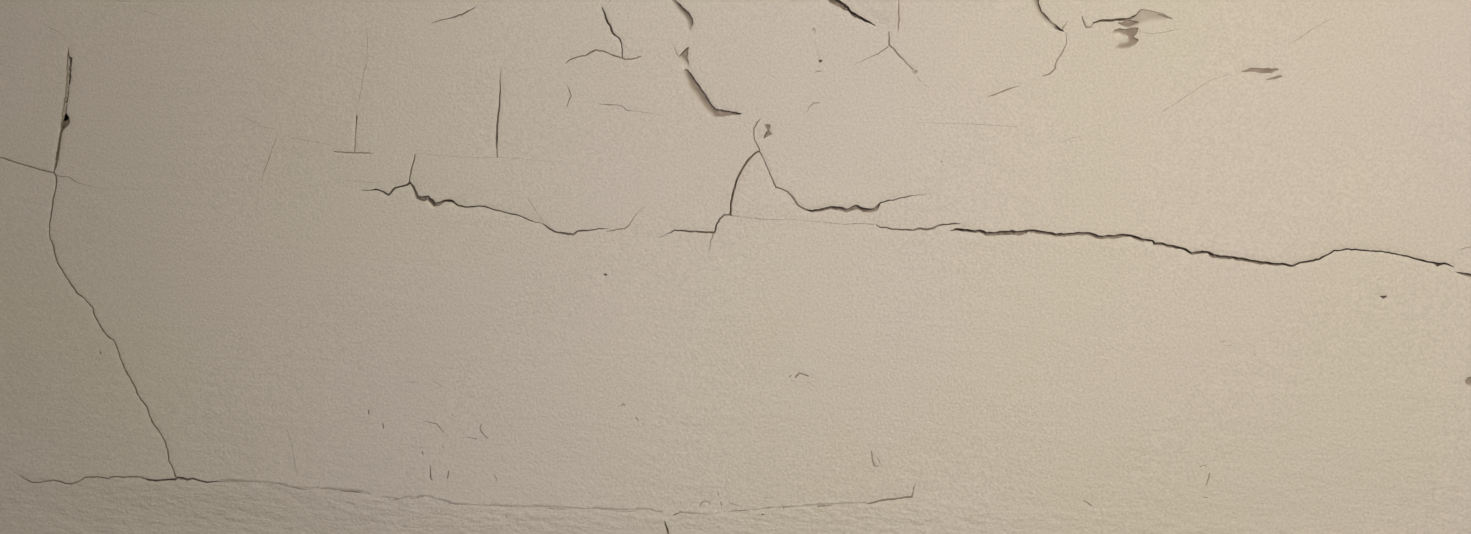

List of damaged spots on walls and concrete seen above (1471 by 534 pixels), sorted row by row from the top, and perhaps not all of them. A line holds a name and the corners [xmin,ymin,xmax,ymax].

crack [0,25,234,484]
crack [241,0,1471,277]
spalling [1082,9,1177,49]
crack [868,481,917,504]